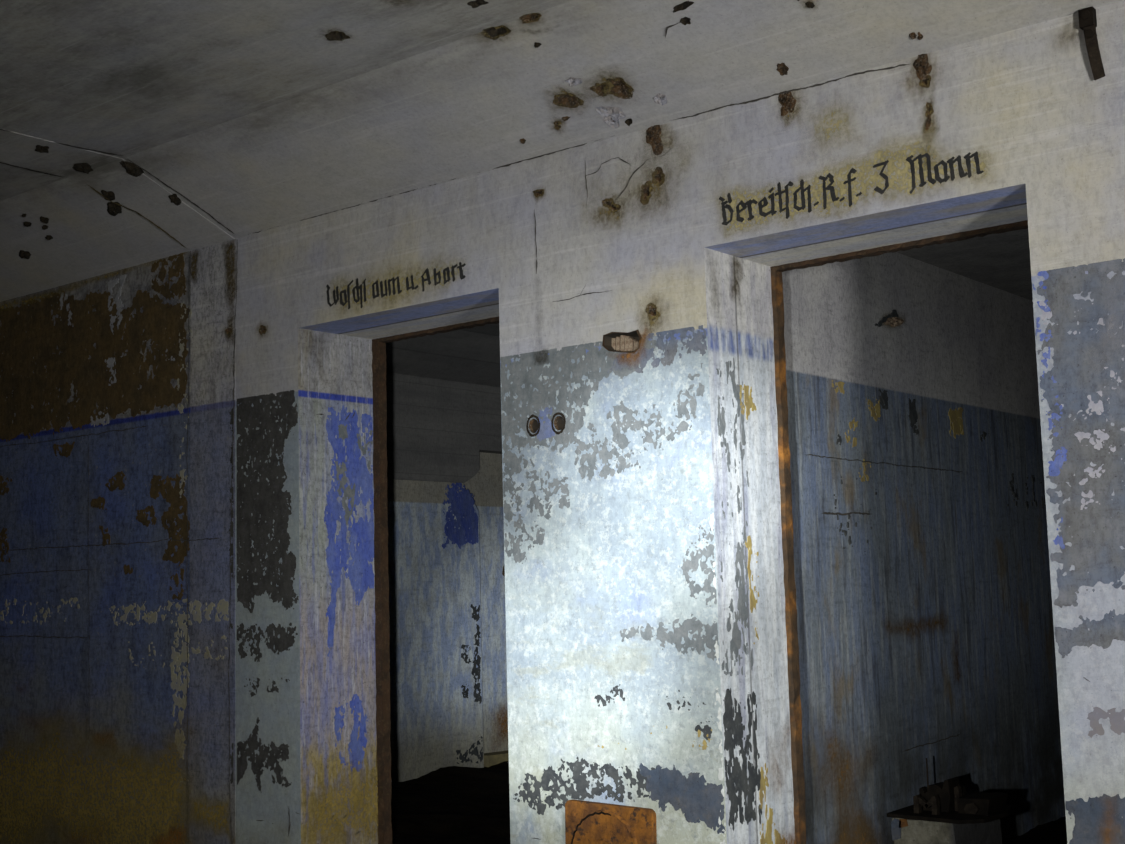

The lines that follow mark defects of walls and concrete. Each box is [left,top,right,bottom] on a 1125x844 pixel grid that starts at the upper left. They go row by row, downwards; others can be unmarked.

spalling [481,13,542,40]
spalling [553,75,634,131]
crack [670,64,909,121]
spalling [638,125,673,207]
peeling [1007,258,1125,658]
peeling [0,253,299,759]
peeling [324,405,374,657]
peeling [442,483,479,549]
peeling [500,301,787,844]
peeling [230,717,292,793]
peeling [1084,707,1125,738]
peeling [1065,794,1125,844]